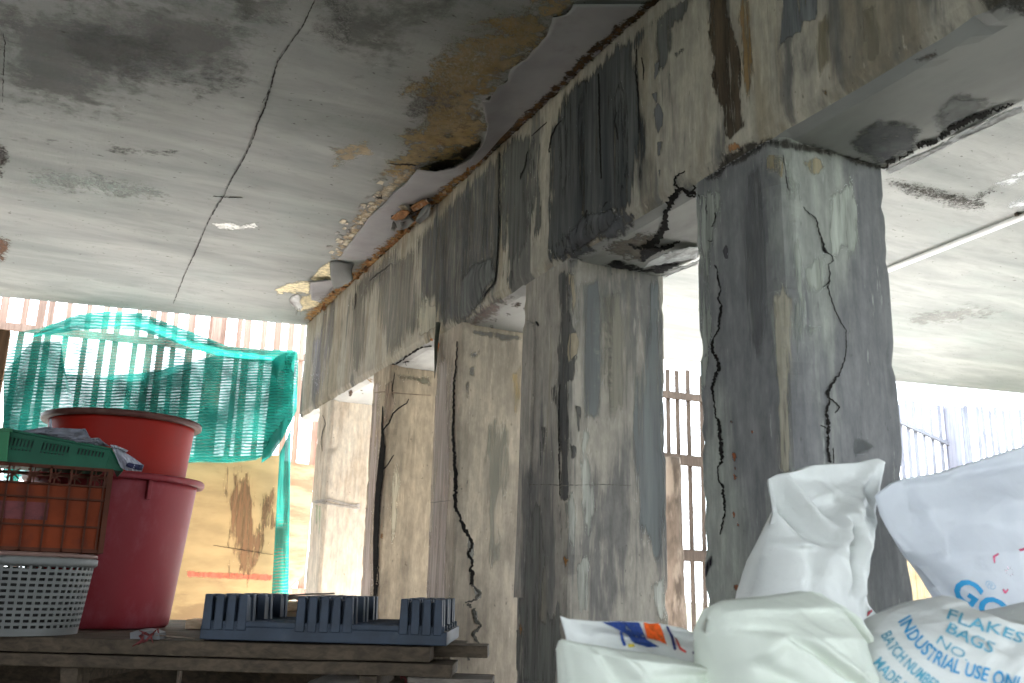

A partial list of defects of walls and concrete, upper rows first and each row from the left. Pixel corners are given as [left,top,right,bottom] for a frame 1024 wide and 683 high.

crack [174,1,315,301]
crack [373,341,482,661]
water stain [349,153,519,371]
flaking render [276,4,646,315]
water stain [380,0,574,176]
rust [305,0,658,321]
peeling [567,333,579,362]
water stain [540,21,653,548]
crack [628,171,726,534]
crack [783,155,847,463]
flaking render [880,103,1024,209]